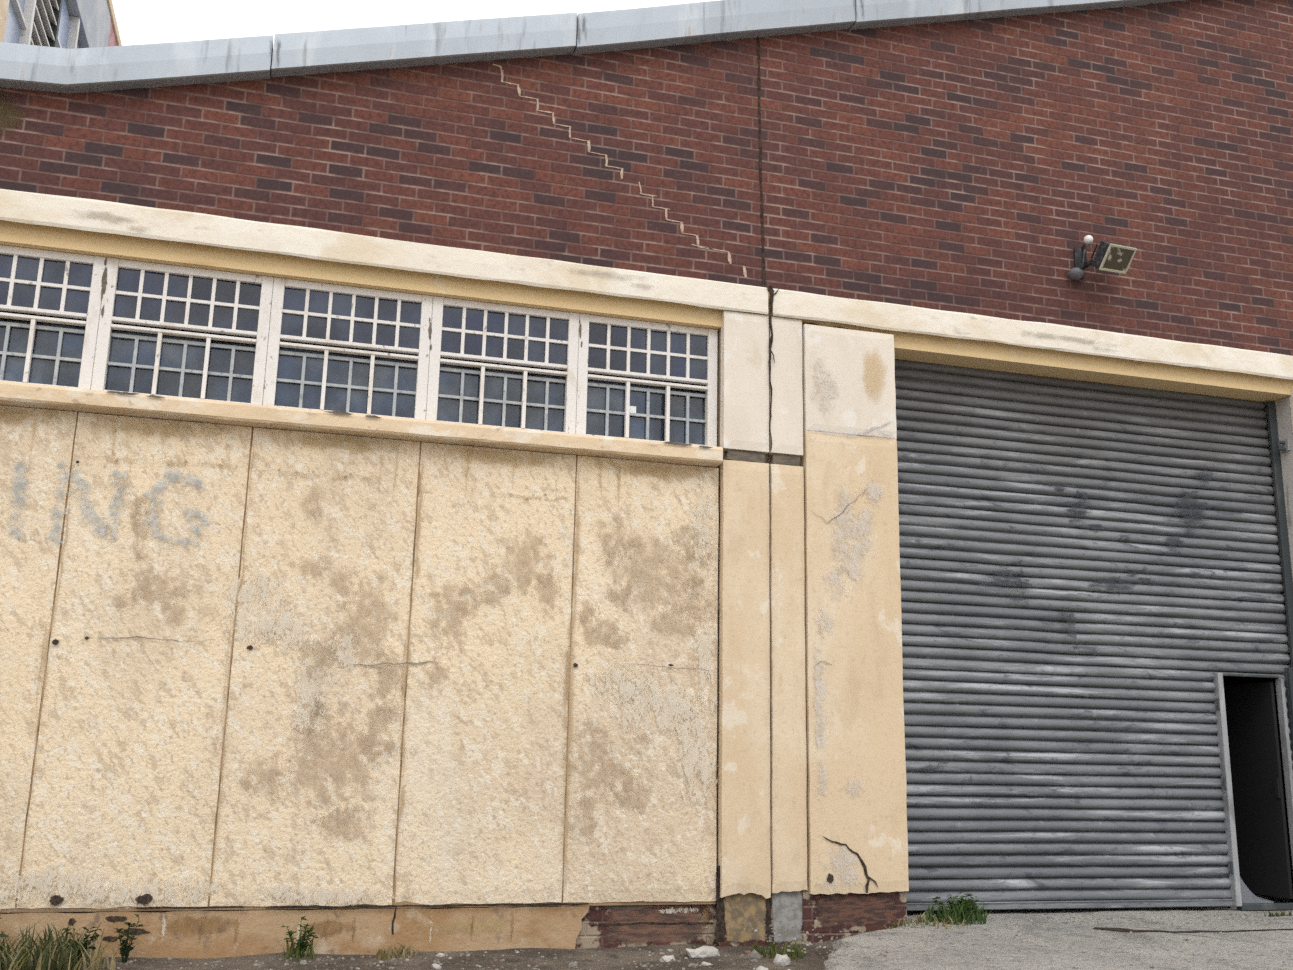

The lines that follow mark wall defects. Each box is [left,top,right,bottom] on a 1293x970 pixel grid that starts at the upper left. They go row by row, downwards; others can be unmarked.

water stain [866,357,882,392]
crack [811,421,893,438]
crack [493,37,853,944]
crack [813,491,865,523]
crack [823,836,878,893]